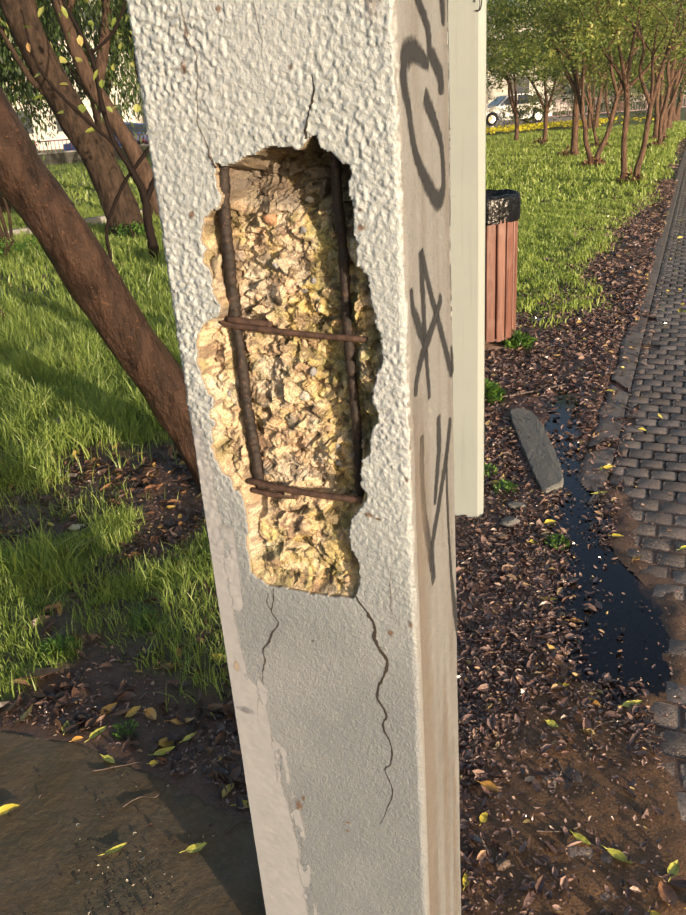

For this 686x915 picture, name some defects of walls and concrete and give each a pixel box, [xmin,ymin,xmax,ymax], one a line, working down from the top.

crack [165,0,217,169]
crack [304,76,315,139]
spalling [192,135,383,915]
crack [257,589,279,722]
crack [354,571,397,823]